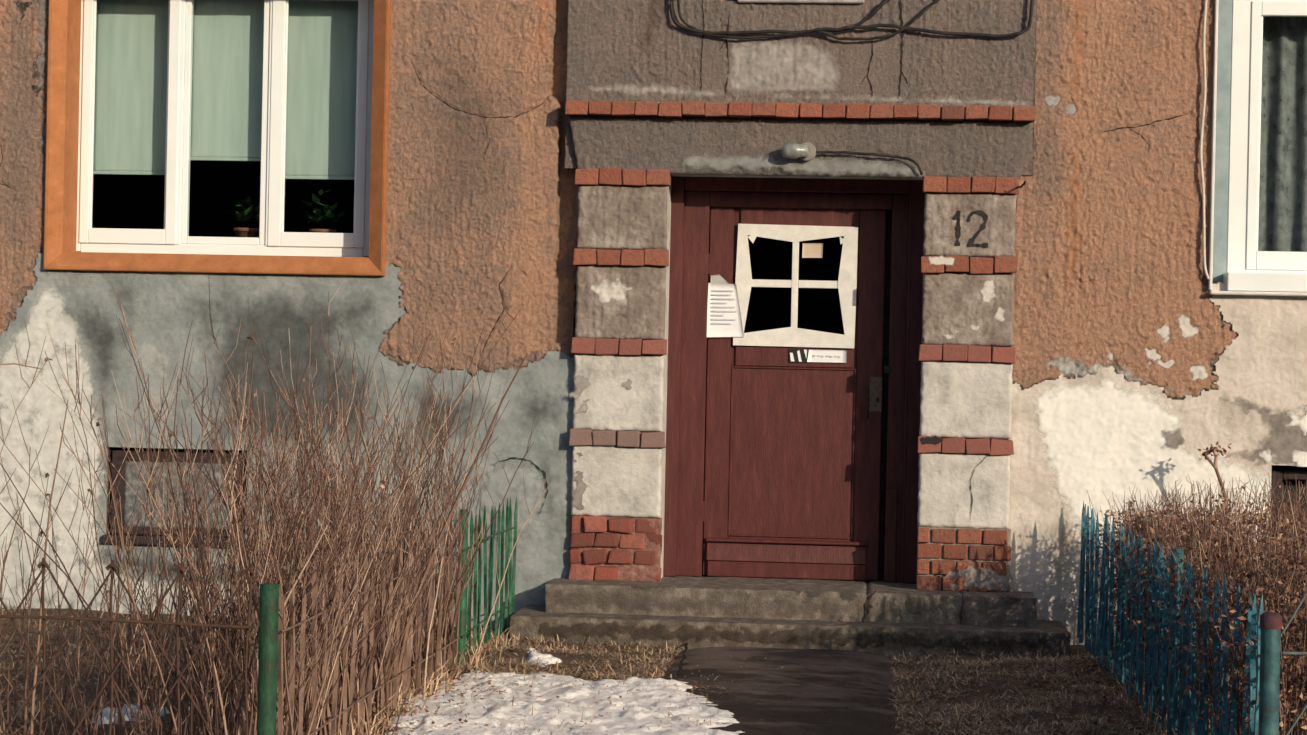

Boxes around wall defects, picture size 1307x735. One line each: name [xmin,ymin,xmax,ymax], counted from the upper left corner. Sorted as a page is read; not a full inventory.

flaking render [0,252,590,630]
flaking render [945,280,1307,645]